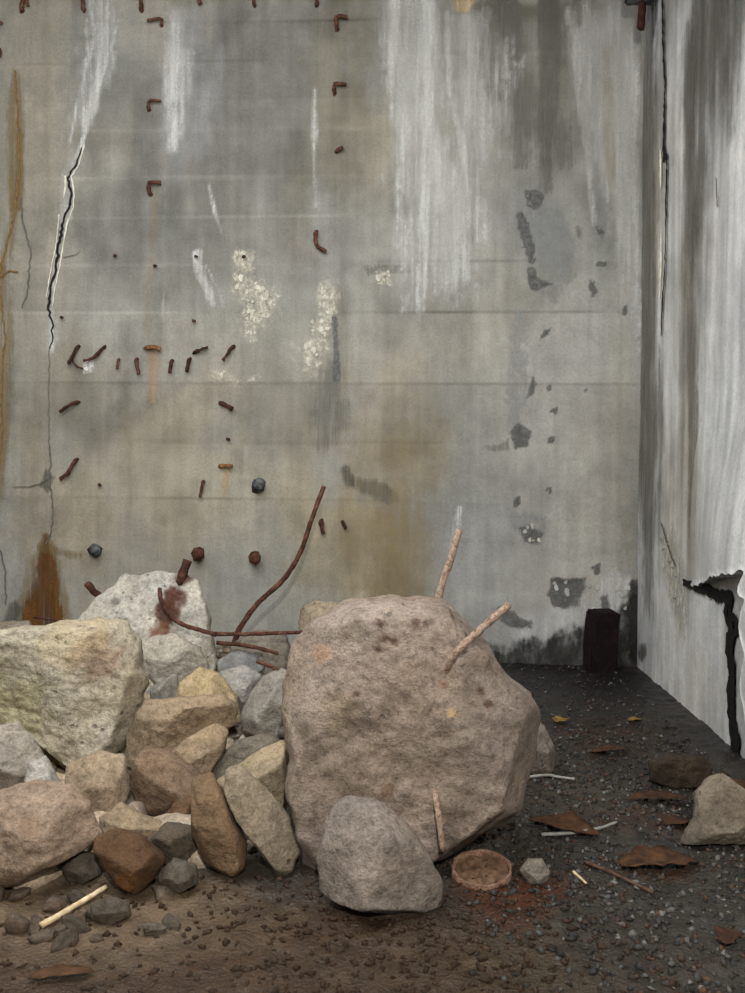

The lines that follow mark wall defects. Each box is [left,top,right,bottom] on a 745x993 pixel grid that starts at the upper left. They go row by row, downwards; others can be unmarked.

leakage [402,0,468,251]
crack [0,71,85,544]
spalling [506,351,535,449]
crack [0,550,8,604]
rust [7,537,67,625]
leakage [493,614,584,666]
spalling [548,563,630,611]
leakage [600,577,650,667]
crack [682,578,740,755]